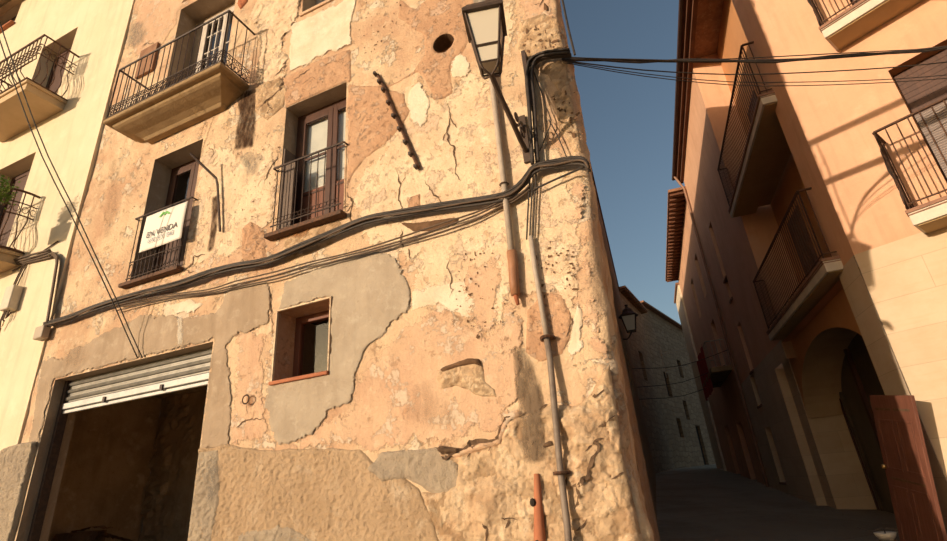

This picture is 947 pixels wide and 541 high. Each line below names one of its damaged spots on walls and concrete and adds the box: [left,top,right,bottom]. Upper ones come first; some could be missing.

flaking render [255,0,474,189]
crack [397,172,441,256]
crack [443,101,461,181]
flaking render [437,249,575,406]
spalling [421,365,643,541]